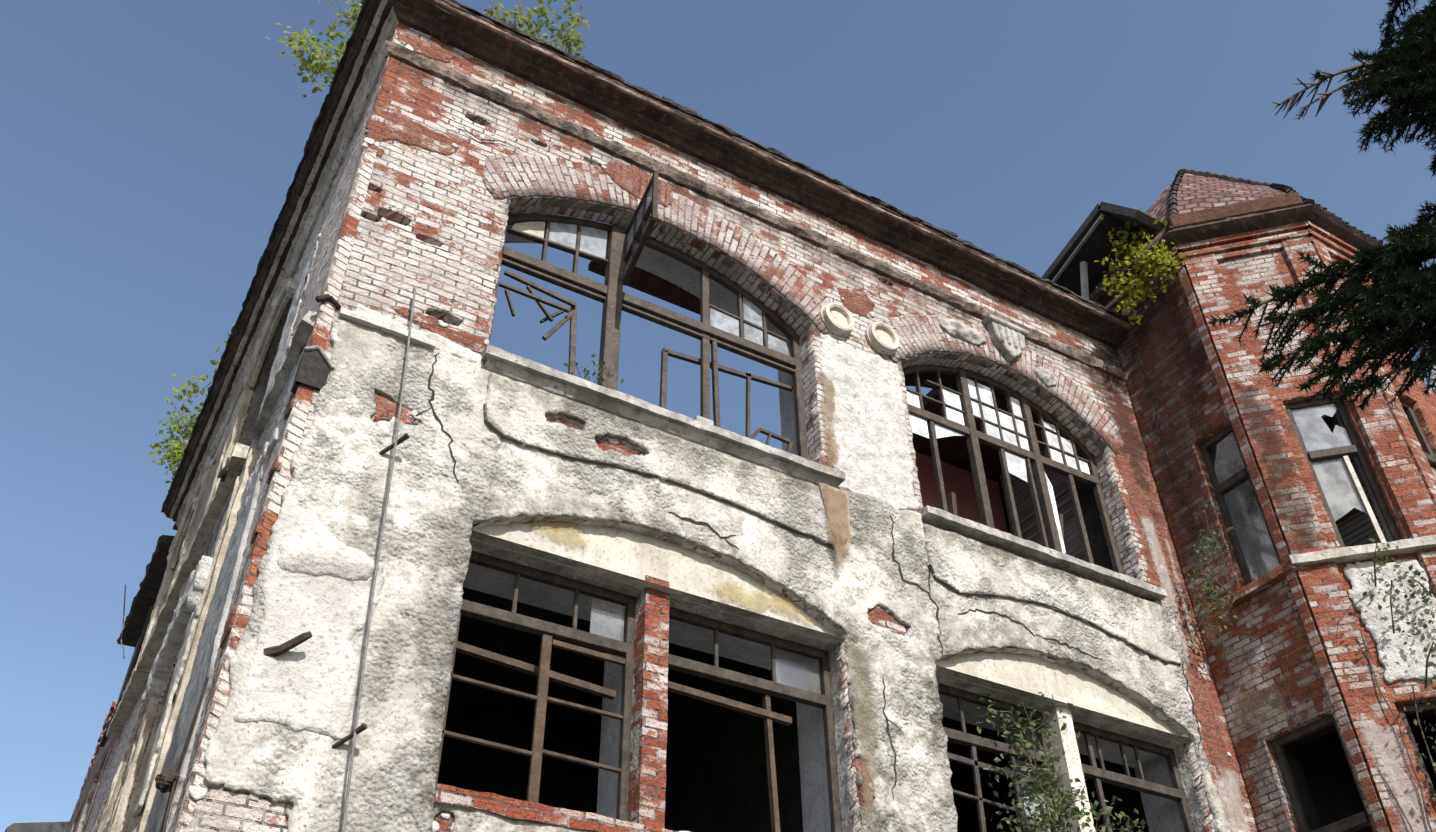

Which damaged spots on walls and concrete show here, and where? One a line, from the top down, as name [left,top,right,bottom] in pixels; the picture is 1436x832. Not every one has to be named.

spalling [361,109,458,157]
spalling [360,188,407,225]
spalling [390,306,490,354]
spalling [373,391,422,425]
crack [413,353,459,483]
spalling [545,415,583,430]
spalling [595,438,646,457]
crack [668,512,740,550]
flaking render [132,390,295,818]
spalling [867,606,909,636]
crack [890,515,1102,660]
spalling [189,781,288,832]